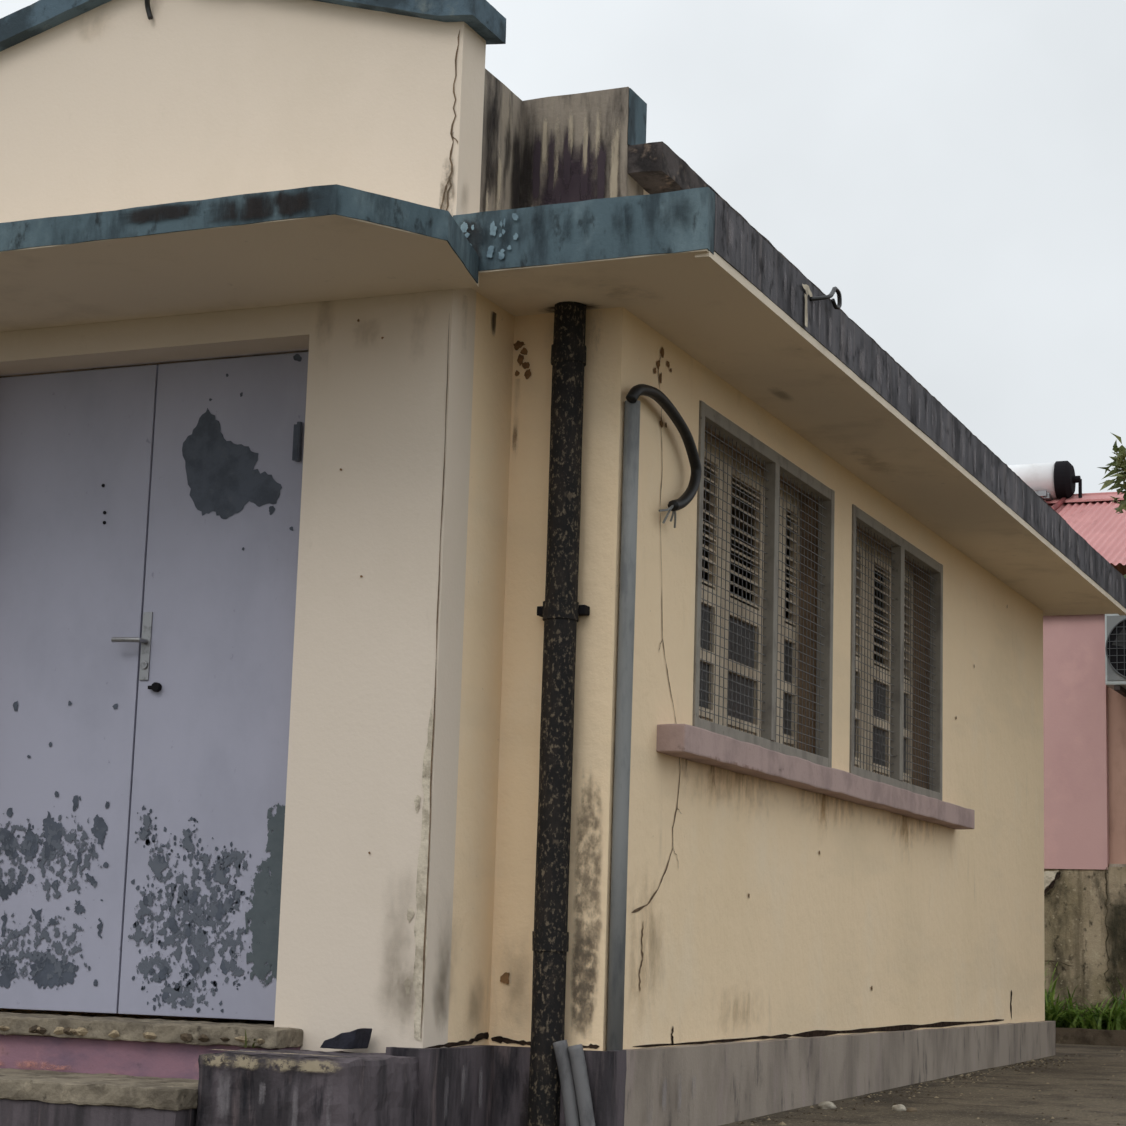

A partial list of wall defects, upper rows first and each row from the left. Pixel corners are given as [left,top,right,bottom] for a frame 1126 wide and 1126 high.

crack [440,31,460,211]
leakage [486,102,619,211]
peeling [461,213,518,260]
peeling [182,398,282,519]
crack [659,617,676,720]
peeling [0,795,109,990]
peeling [128,803,285,1013]
leakage [572,793,600,1030]
crack [631,758,682,990]
leakage [1106,897,1126,983]
crack [633,990,1012,1047]